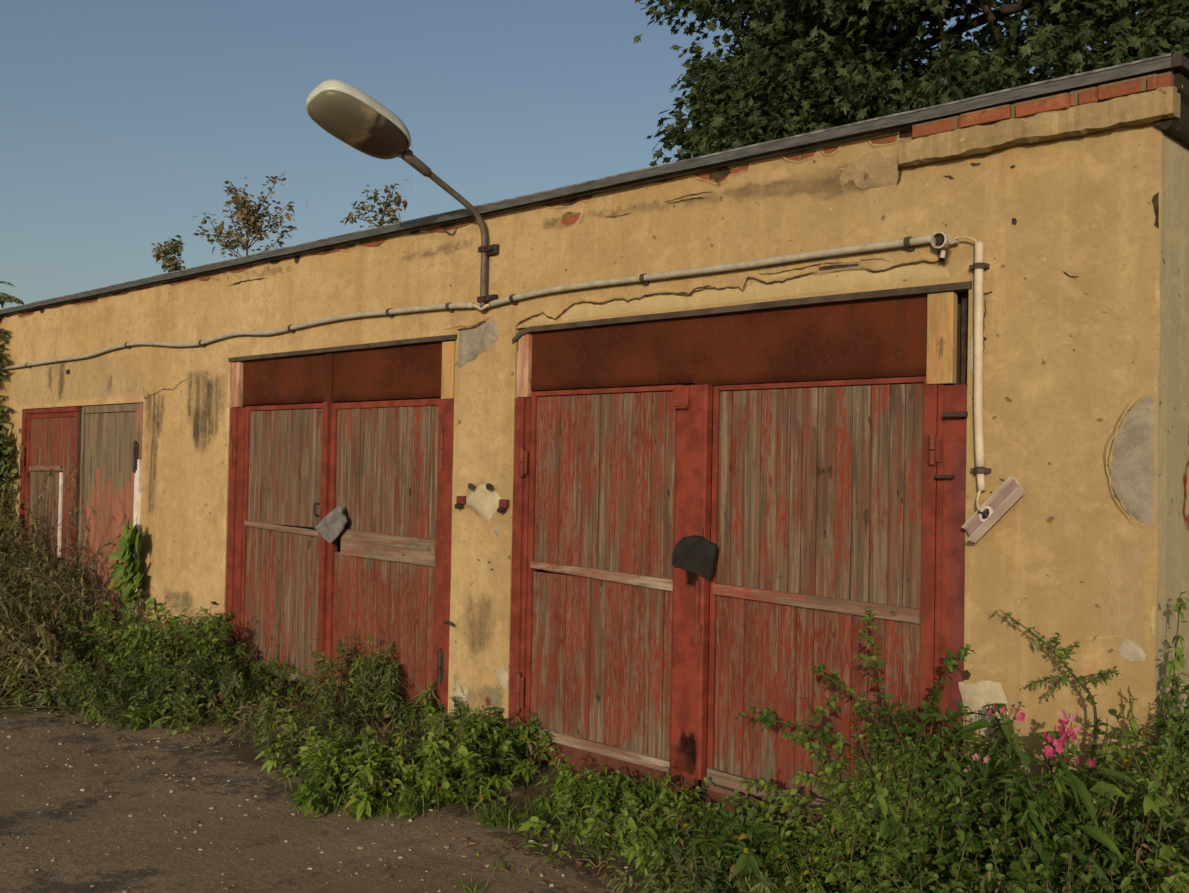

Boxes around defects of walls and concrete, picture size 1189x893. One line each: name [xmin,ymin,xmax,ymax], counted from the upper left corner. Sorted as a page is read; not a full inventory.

spalling [780,129,913,190]
spalling [520,193,597,228]
crack [860,253,939,272]
crack [457,321,486,331]
crack [514,263,829,329]
damp [188,377,217,444]
spalling [1103,376,1157,530]